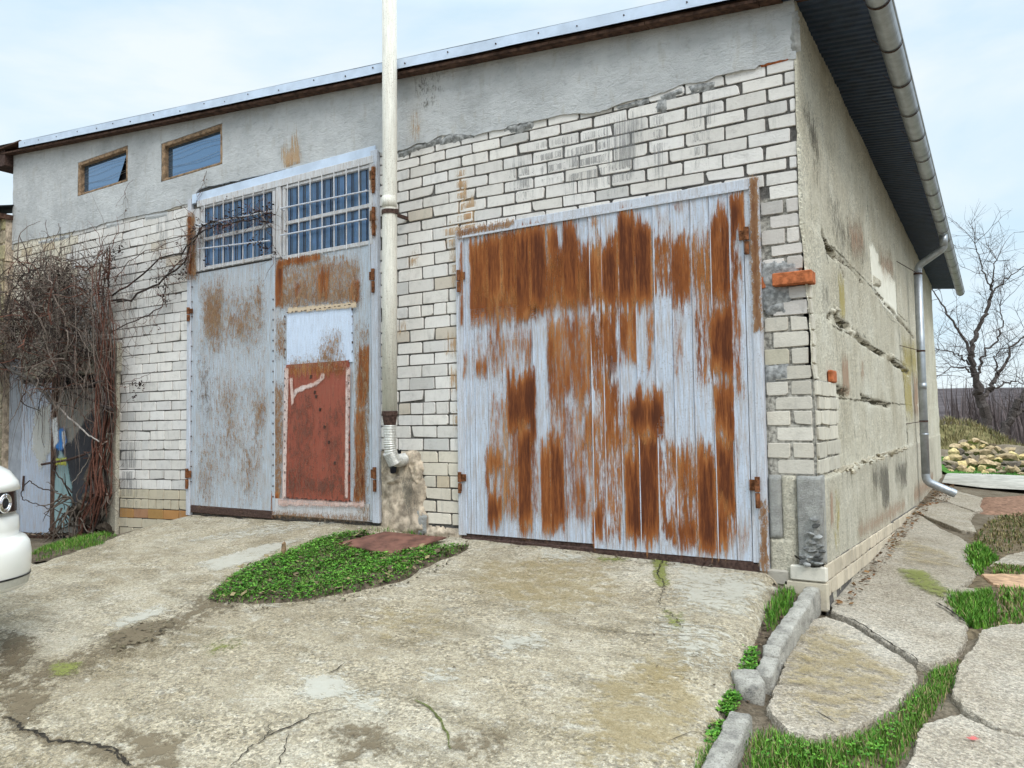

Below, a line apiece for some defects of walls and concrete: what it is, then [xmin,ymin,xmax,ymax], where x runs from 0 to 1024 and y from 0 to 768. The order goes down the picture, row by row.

flaking render [617,82,716,113]
rust [281,131,300,168]
flaking render [398,134,474,158]
flaking render [504,122,534,135]
crack [821,231,911,408]
rust [185,210,370,522]
rust [445,170,770,574]
crack [3,716,132,767]
crack [230,708,343,766]